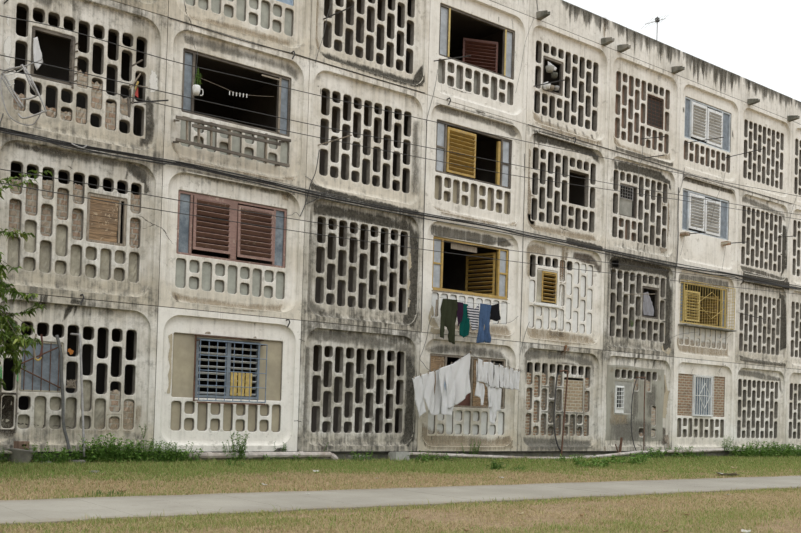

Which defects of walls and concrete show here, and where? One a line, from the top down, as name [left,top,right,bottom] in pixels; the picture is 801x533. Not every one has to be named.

water stain [562,0,801,107]
water stain [312,330,387,347]
water stain [399,345,512,450]